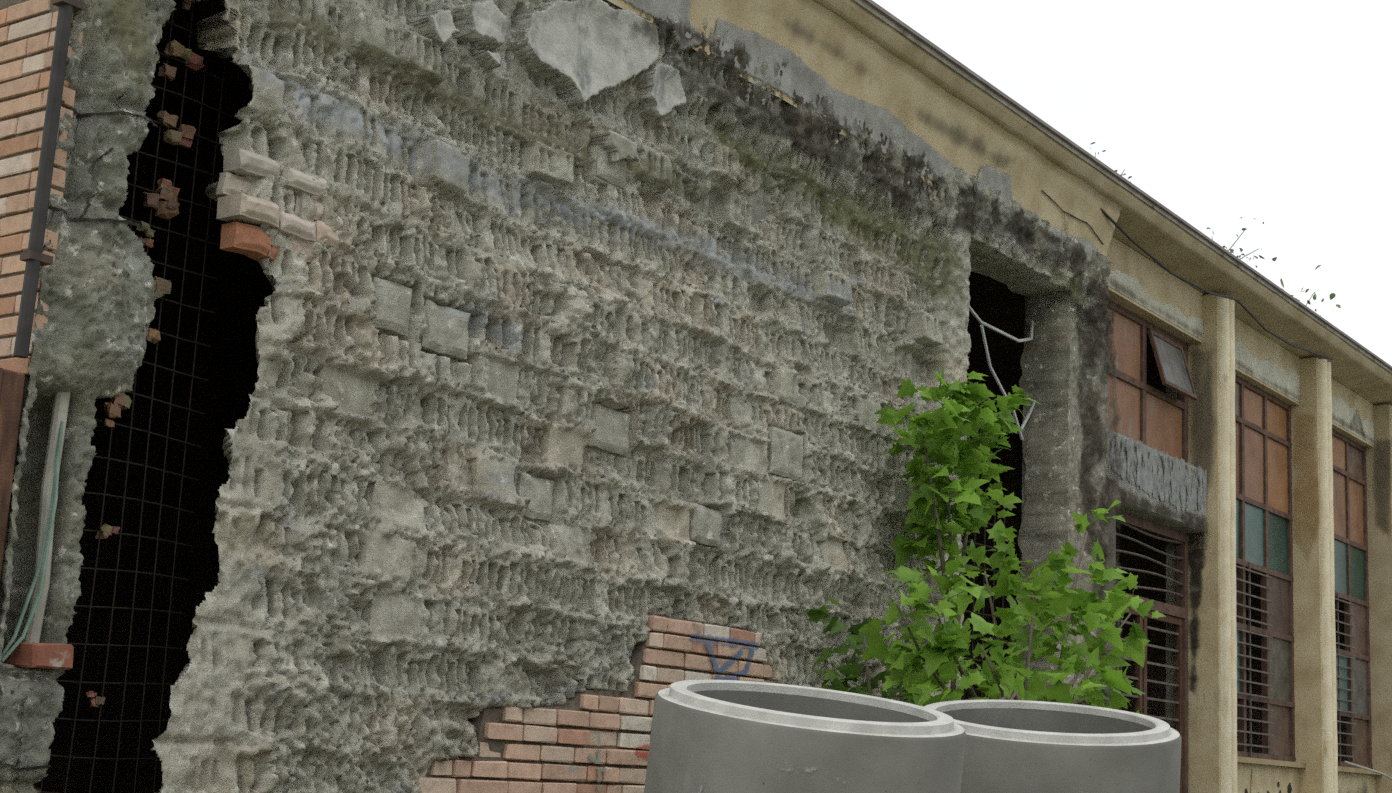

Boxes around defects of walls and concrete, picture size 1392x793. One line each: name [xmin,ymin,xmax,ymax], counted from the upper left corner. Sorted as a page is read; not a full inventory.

spalling [0,0,177,793]
spalling [150,0,1207,793]
water stain [637,16,1135,333]